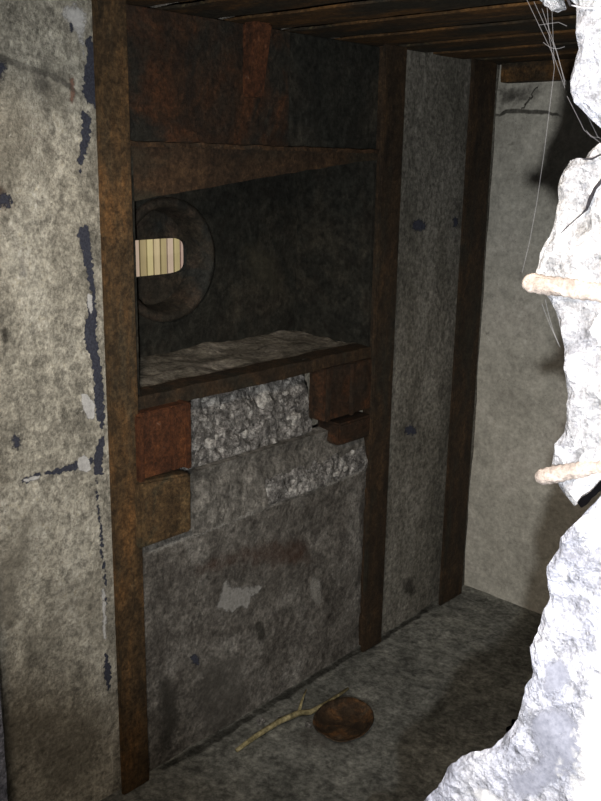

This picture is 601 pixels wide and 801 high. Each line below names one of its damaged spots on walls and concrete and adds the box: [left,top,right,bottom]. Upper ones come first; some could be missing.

spalling [540,0,566,12]
crack [567,0,601,9]
crack [495,87,558,116]
crack [561,179,601,233]
spalling [522,273,601,303]
crack [21,224,107,604]
spalling [535,461,601,485]
crack [577,481,601,508]
crack [103,653,112,691]